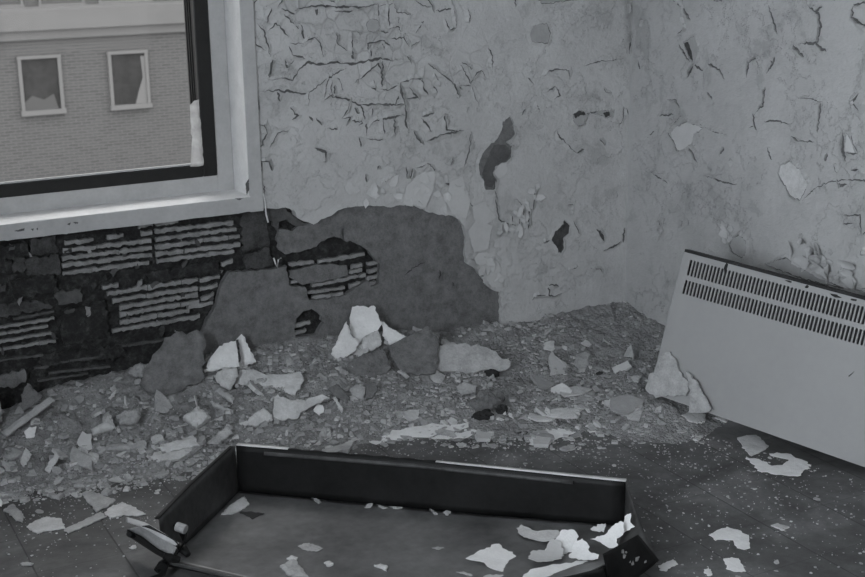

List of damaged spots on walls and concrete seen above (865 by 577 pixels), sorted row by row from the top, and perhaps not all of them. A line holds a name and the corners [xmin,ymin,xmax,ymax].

peeling [527,19,554,48]
crack [253,0,494,220]
crack [522,2,643,156]
crack [647,0,737,185]
crack [744,0,865,201]
spalling [0,116,546,409]
crack [484,181,551,267]
flaking render [549,219,572,256]
crack [532,228,627,301]
peeling [764,237,865,295]
crack [843,214,865,256]